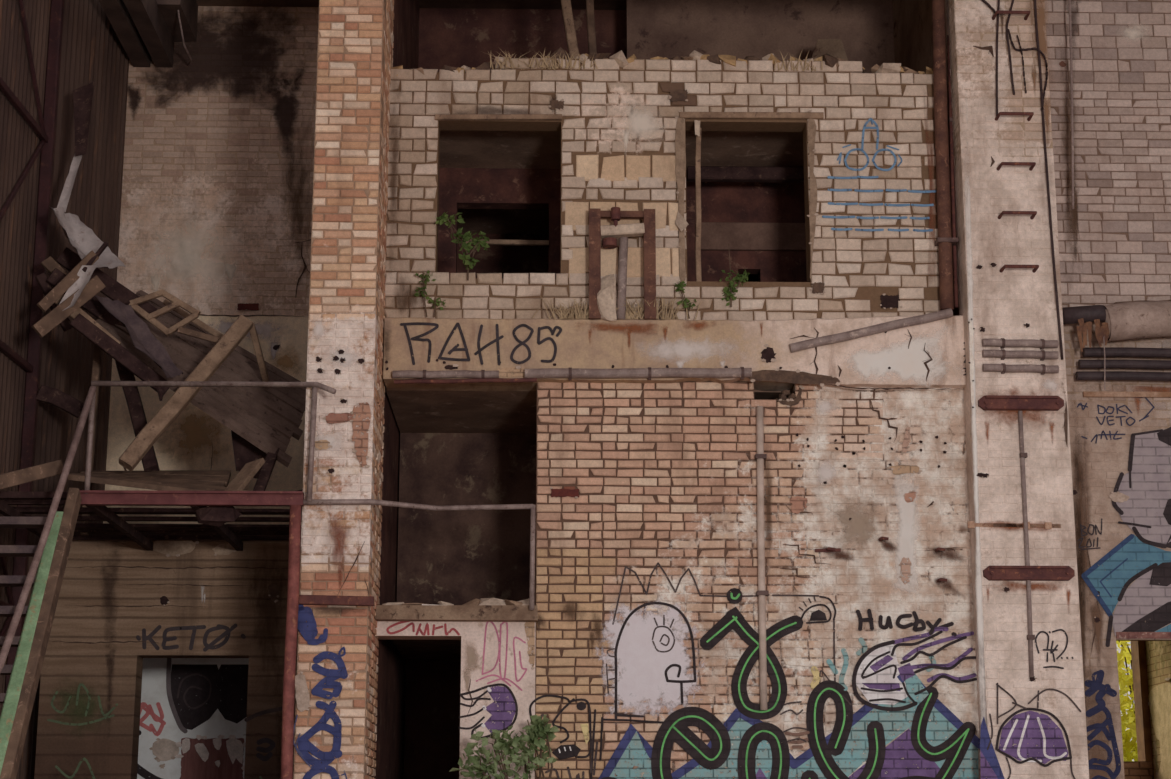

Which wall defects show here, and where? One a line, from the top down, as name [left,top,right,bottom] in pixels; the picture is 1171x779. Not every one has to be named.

leakage [128,86,140,113]
leakage [274,87,308,250]
spalling [316,349,365,374]
peeling [315,440,332,450]
peeling [323,398,371,468]
peeling [788,496,810,515]
peeling [887,426,922,591]